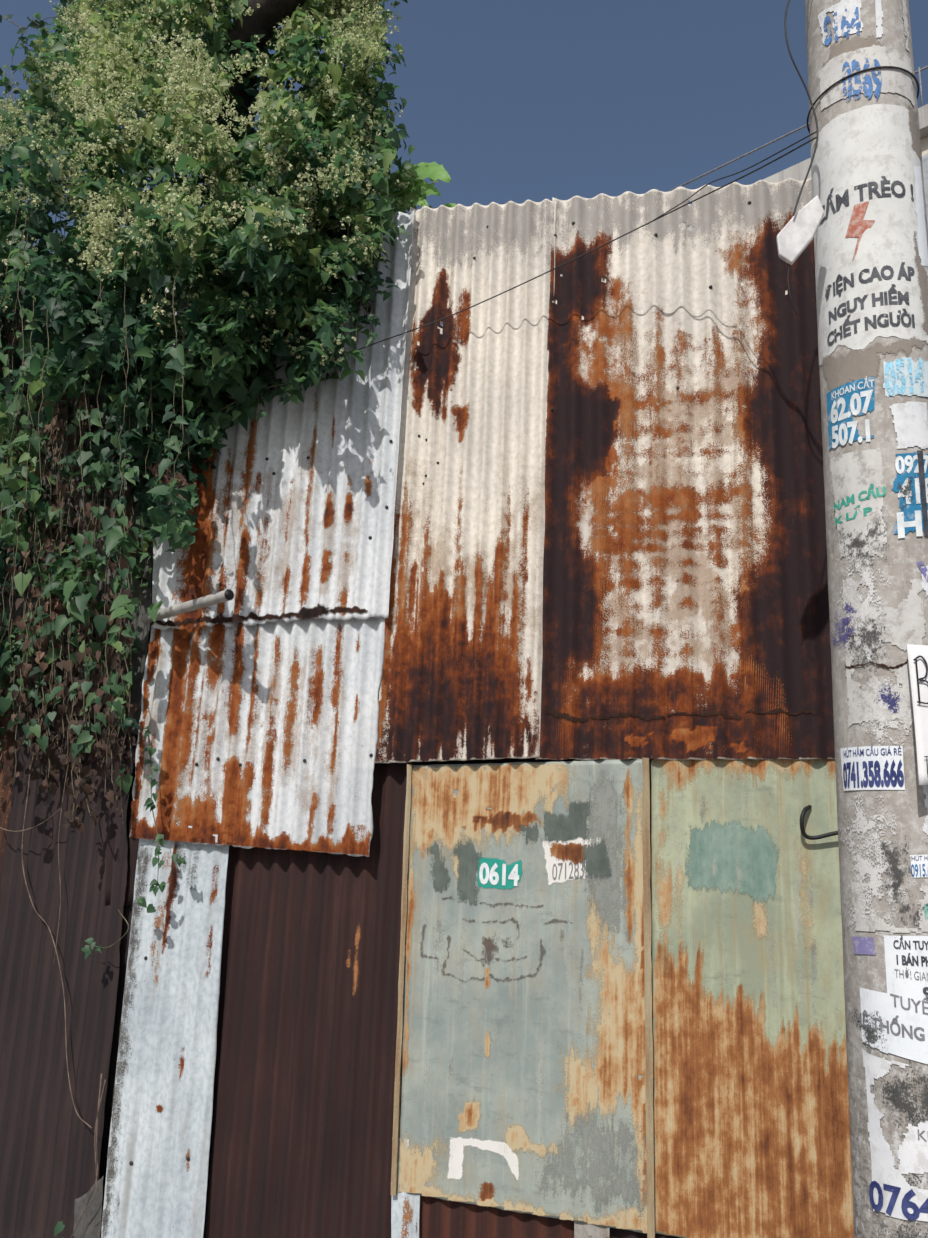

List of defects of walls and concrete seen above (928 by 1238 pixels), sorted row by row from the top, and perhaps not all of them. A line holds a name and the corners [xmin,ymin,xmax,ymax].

corrosion [130,393,373,997]
peeling [411,763,577,882]
corrosion [375,207,854,1238]